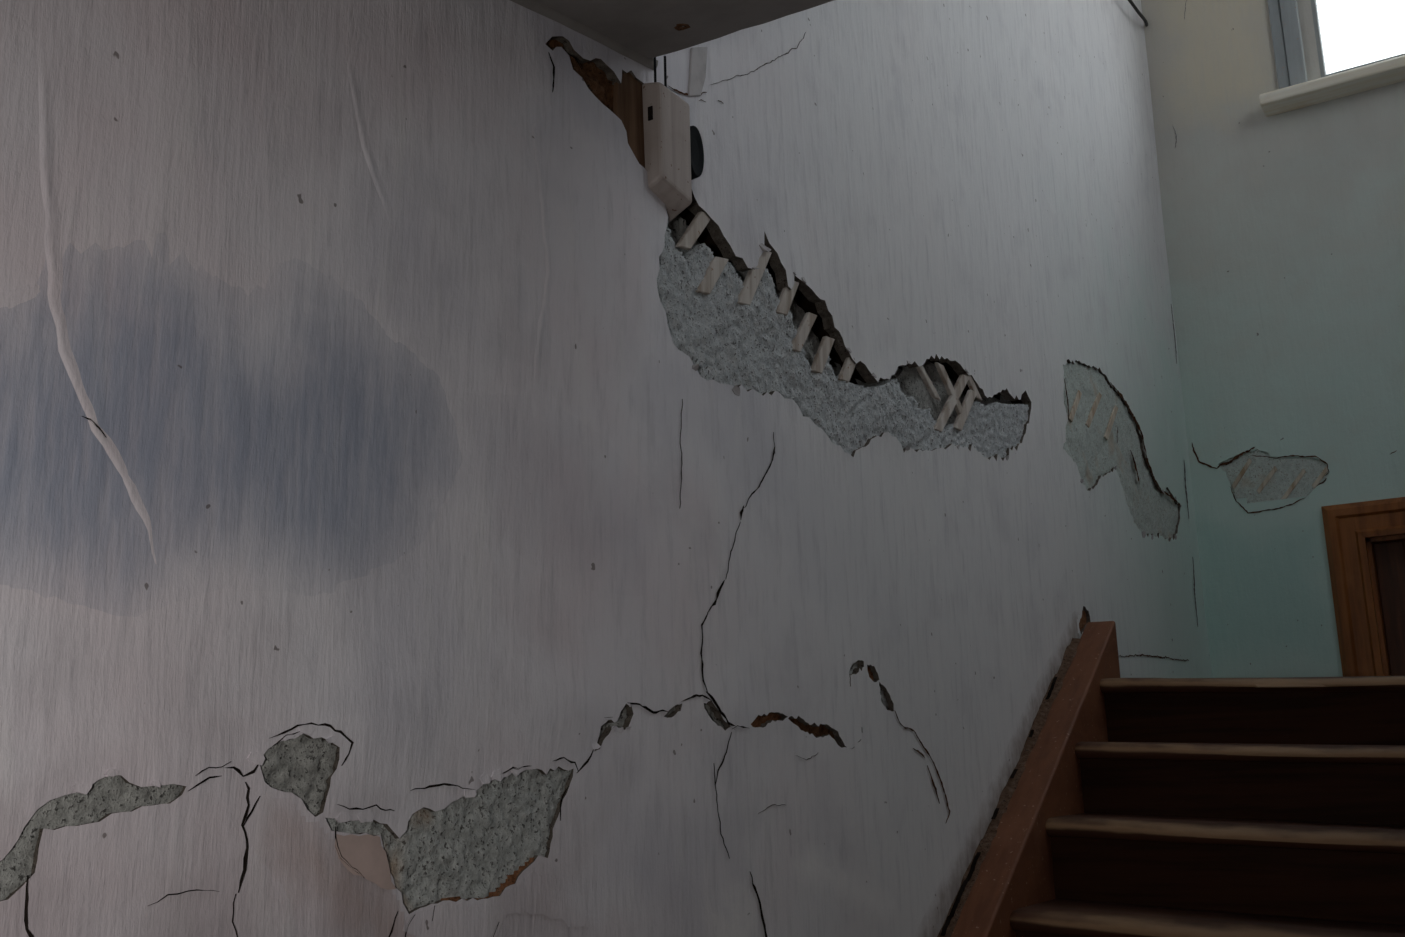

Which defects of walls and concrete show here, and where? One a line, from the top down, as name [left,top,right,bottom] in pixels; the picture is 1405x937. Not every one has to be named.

spalling [546,39,645,168]
spalling [657,211,1029,460]
crack [677,399,685,509]
spalling [1063,362,1181,540]
spalling [1192,443,1330,513]
crack [577,432,775,937]
spalling [0,769,183,937]
crack [148,761,260,937]
crack [335,804,394,878]
crack [389,906,435,937]
spalling [247,722,596,937]